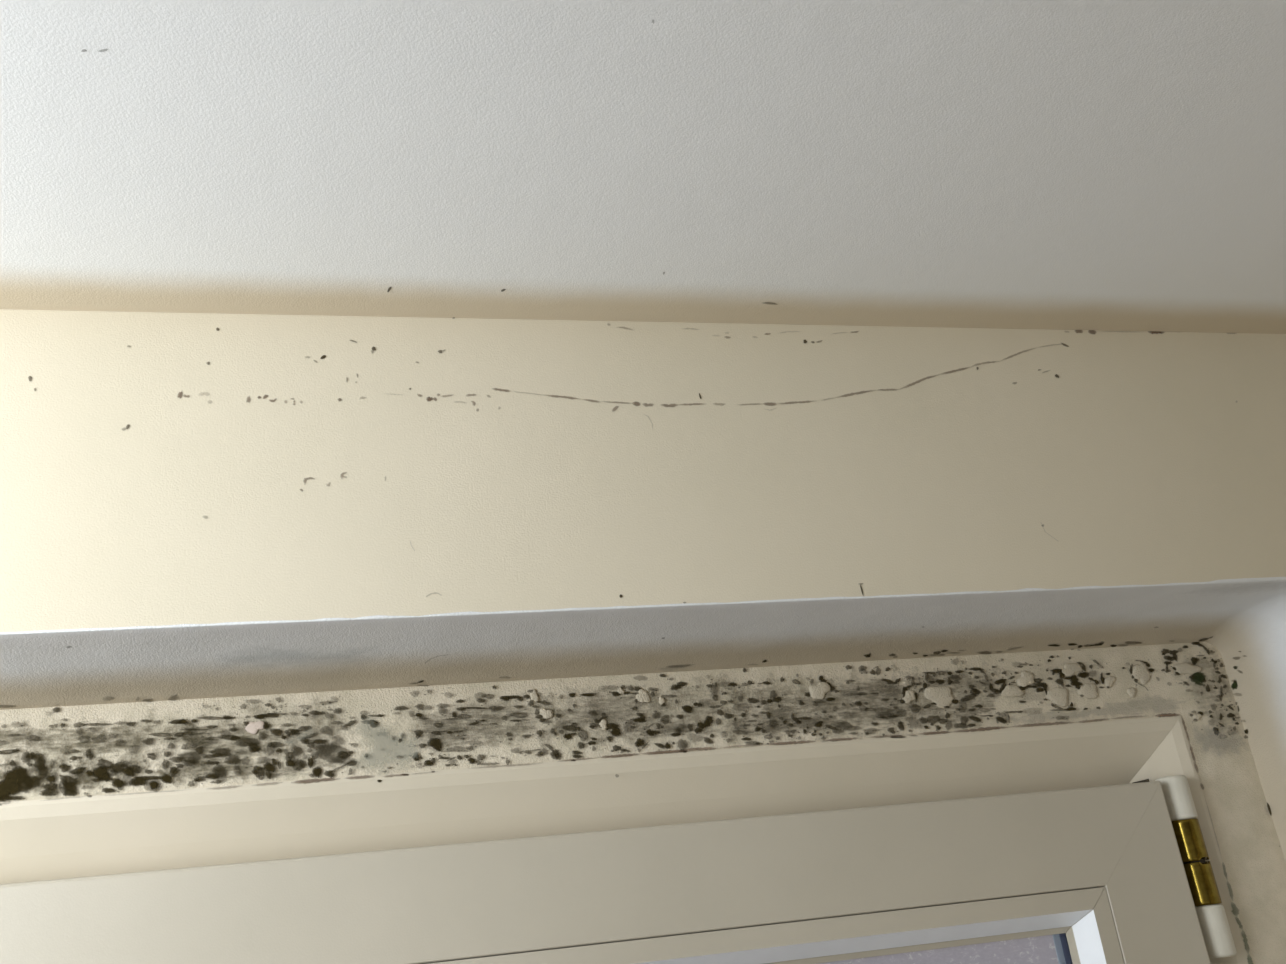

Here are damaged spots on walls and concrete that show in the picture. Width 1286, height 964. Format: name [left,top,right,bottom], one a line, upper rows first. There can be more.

leakage [0,638,1248,802]